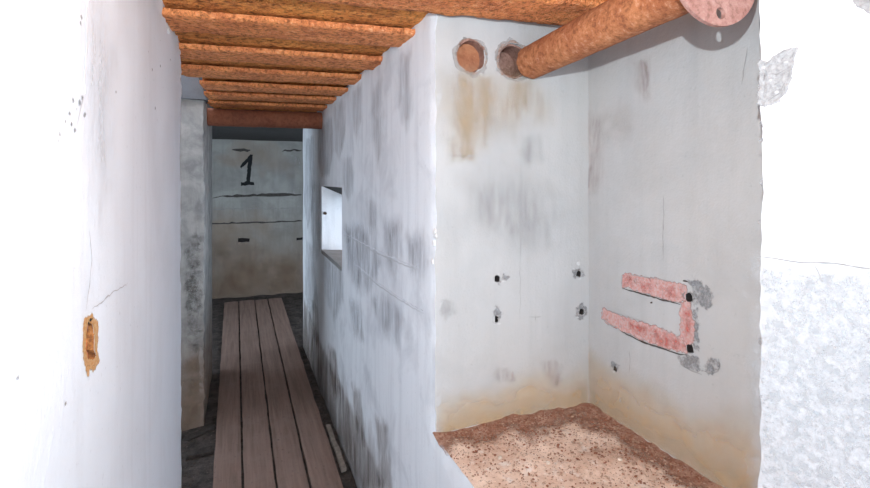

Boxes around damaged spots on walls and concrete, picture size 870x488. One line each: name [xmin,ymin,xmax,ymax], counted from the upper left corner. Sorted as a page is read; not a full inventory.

spalling [757,47,798,107]
crack [86,231,125,308]
peeling [601,273,720,375]